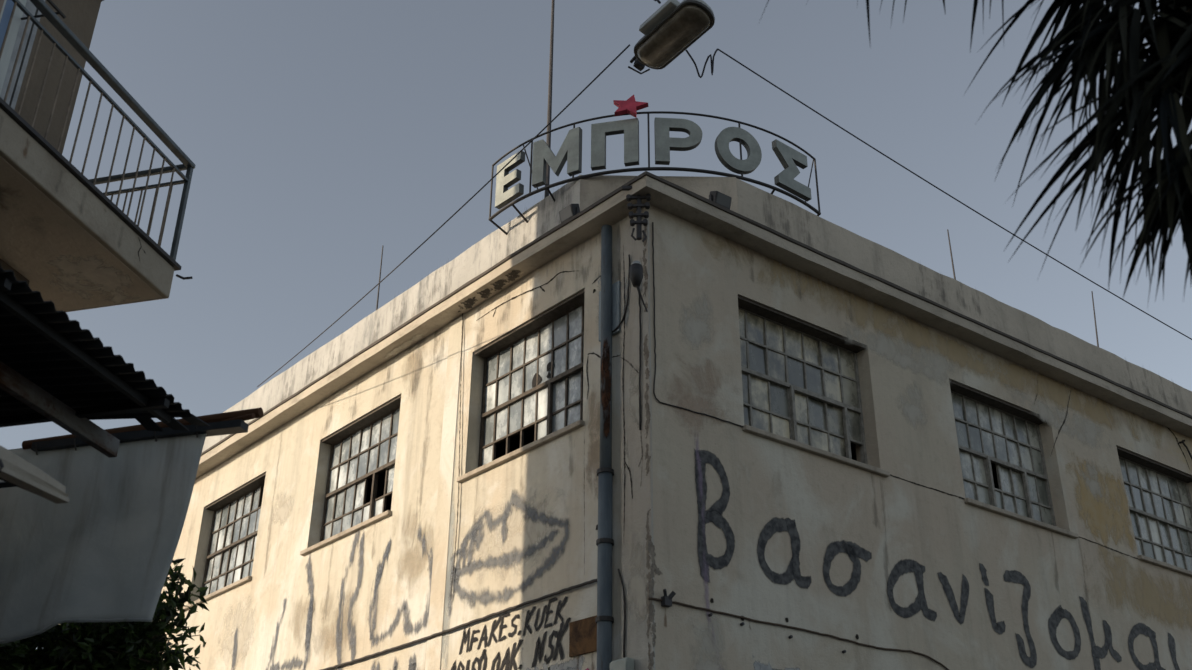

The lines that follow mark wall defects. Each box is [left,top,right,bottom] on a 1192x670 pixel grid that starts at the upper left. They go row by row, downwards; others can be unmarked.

rust [601,340,611,438]